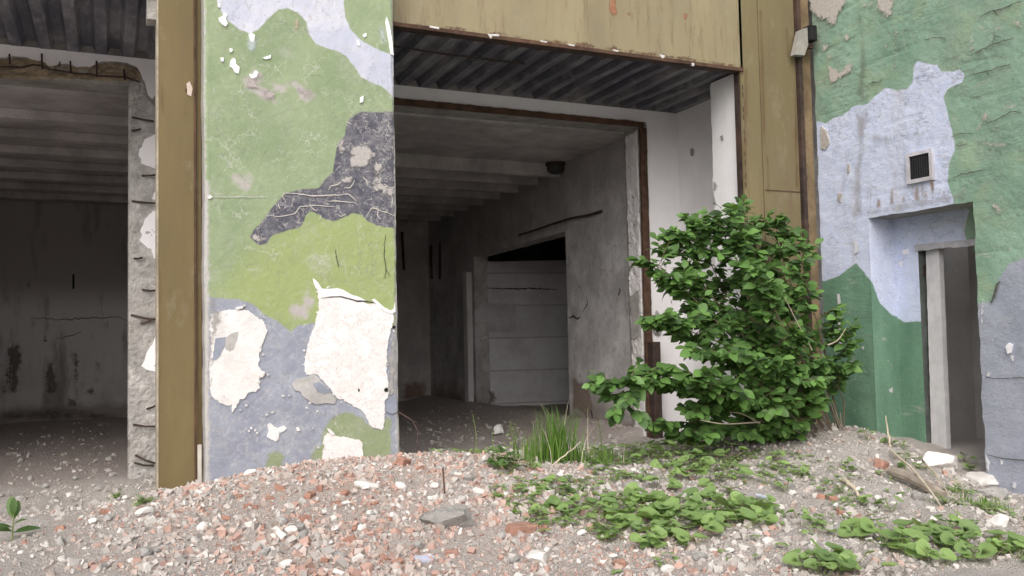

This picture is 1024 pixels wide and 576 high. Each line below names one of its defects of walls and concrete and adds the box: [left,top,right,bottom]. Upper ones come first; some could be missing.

peeling [220,48,275,98]
peeling [381,17,394,56]
spalling [809,0,847,25]
spalling [822,44,852,83]
crack [969,1,1021,76]
peeling [338,140,394,195]
spalling [0,53,155,479]
crack [488,284,557,292]
crack [31,316,127,339]
peeling [208,303,269,412]
peeling [282,279,419,453]